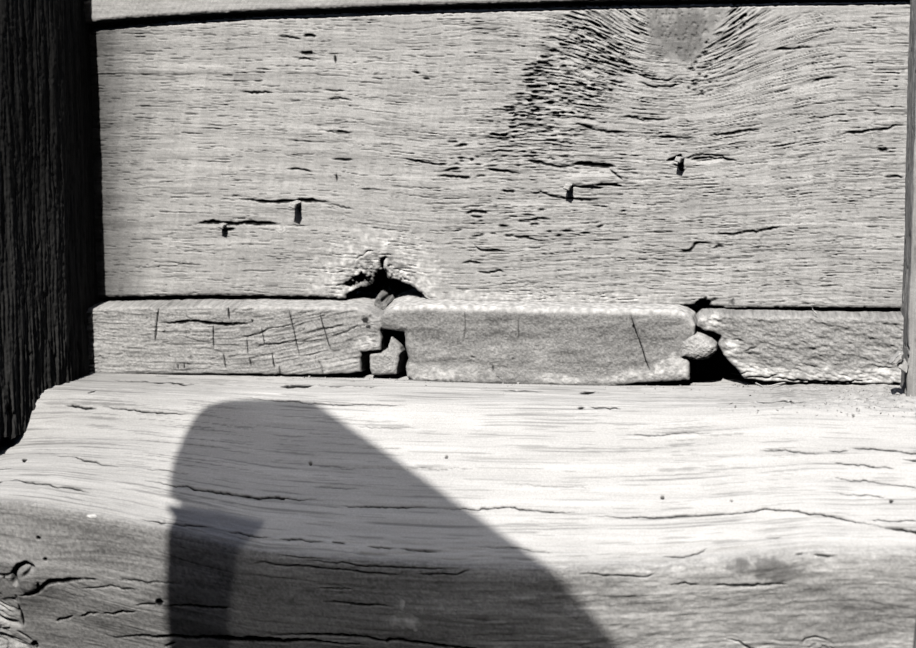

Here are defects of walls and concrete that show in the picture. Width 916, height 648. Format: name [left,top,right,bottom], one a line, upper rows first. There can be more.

crack [155,470,306,501]
crack [614,448,916,534]
crack [0,561,170,639]
crack [176,602,228,610]
crack [134,633,472,648]